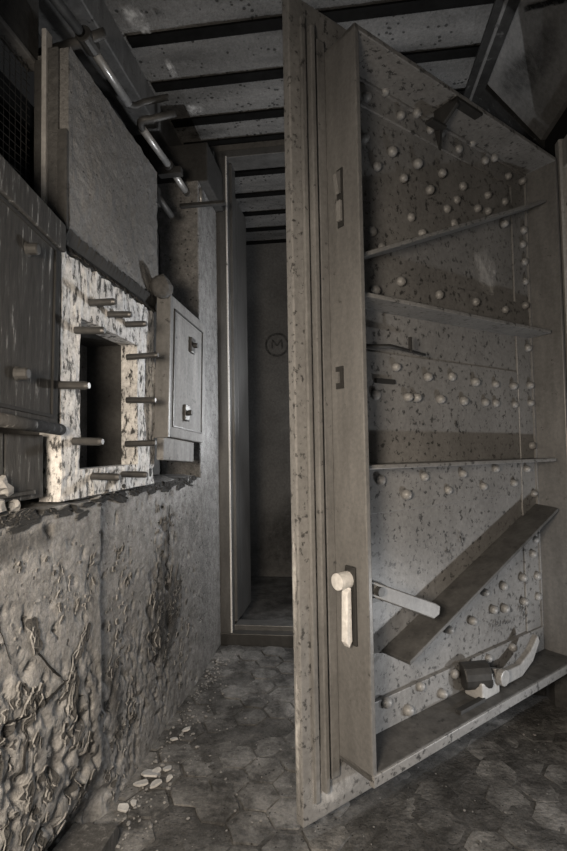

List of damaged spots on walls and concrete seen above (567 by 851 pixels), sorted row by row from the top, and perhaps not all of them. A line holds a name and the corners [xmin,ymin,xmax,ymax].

spalling [0,475,197,535]
spalling [146,504,183,669]
spalling [0,615,173,851]